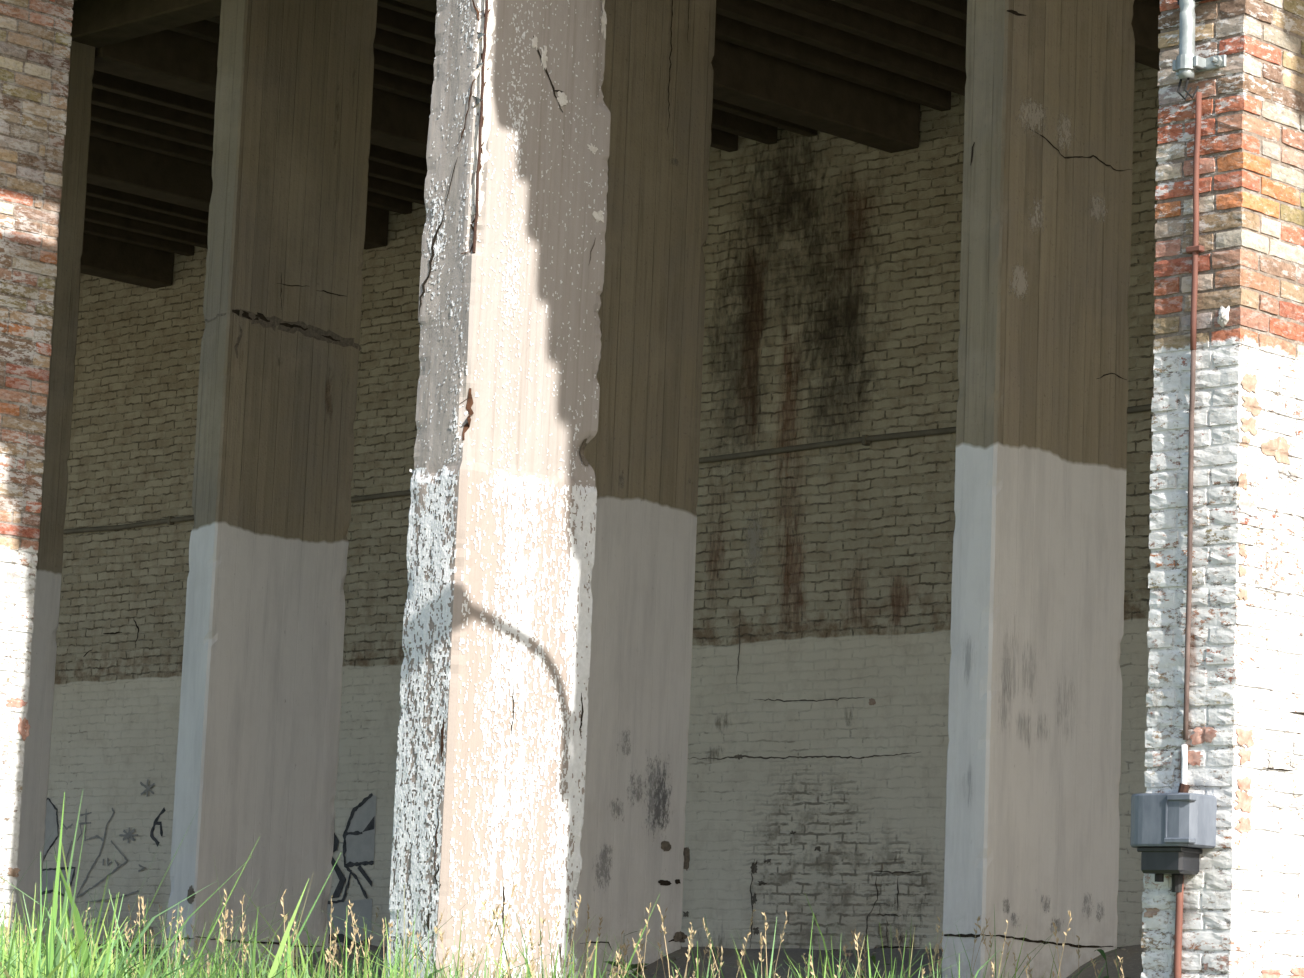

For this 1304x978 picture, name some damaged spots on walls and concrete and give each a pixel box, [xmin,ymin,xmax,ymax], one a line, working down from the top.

crack [533,36,563,112]
crack [416,0,491,325]
crack [1030,129,1131,171]
crack [204,274,362,358]
peeling [1240,373,1298,481]
peeling [386,0,608,978]
peeling [1237,543,1248,600]
peeling [6,698,30,741]
peeling [1187,726,1217,766]
peeling [1235,728,1254,833]
peeling [1144,907,1160,917]
peeling [1260,967,1304,978]